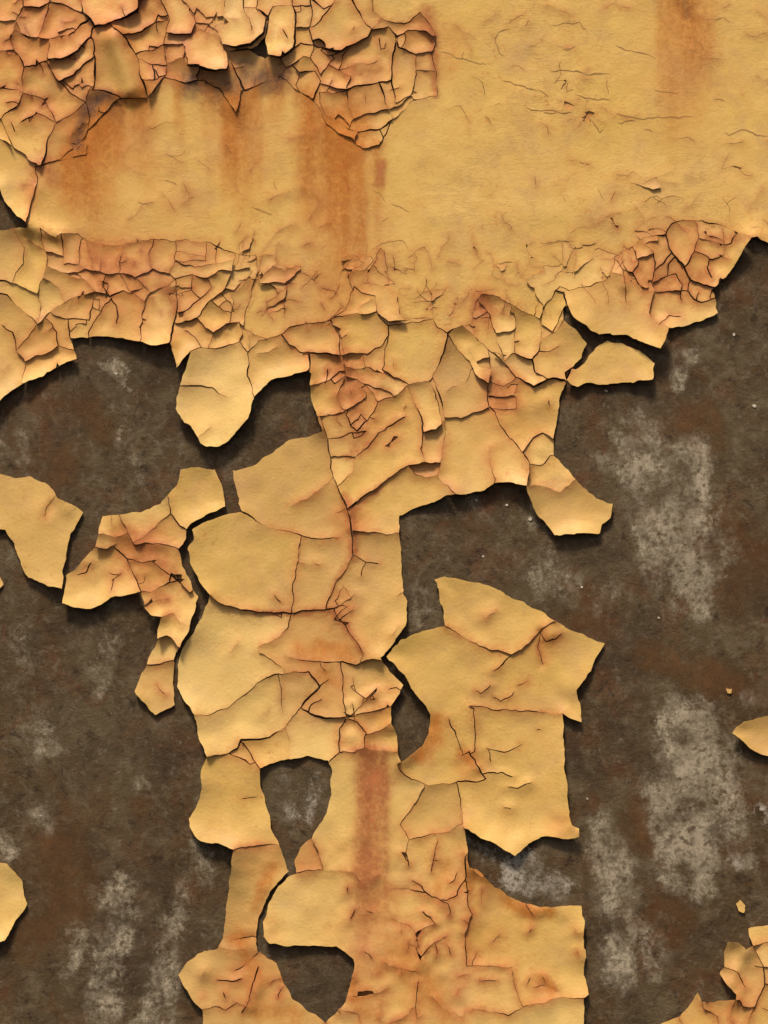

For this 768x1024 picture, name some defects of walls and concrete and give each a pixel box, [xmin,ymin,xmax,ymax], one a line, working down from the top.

crack [438,22,695,132]
rust [330,112,362,224]
crack [366,190,414,270]
damp [615,433,722,619]
peeling [0,220,751,1024]
peeling [732,716,768,756]
damp [642,699,745,897]
damp [502,849,534,891]
damp [590,820,631,913]
damp [603,930,650,981]
peeling [661,925,768,1024]